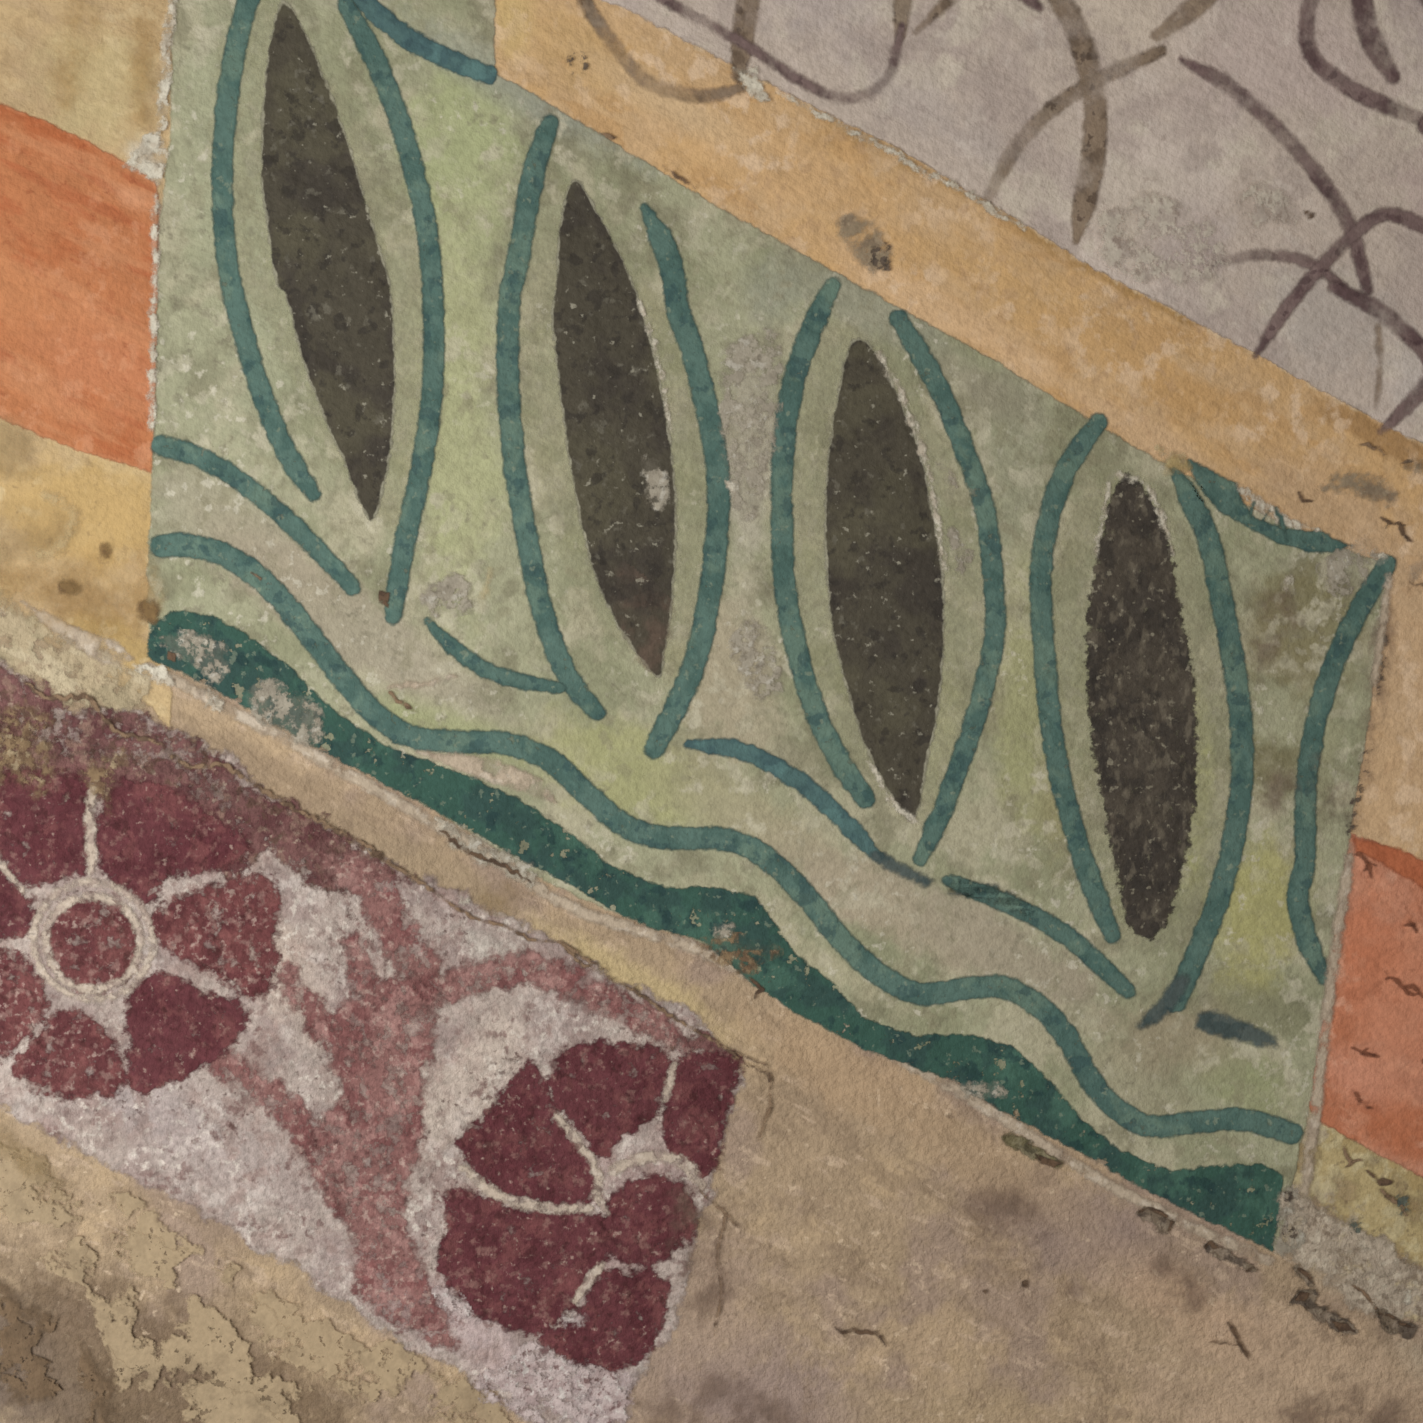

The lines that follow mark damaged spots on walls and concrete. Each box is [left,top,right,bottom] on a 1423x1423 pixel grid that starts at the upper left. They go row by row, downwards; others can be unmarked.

spalling [1001,1133,1062,1168]
spalling [1136,1206,1174,1234]
crack [700,1190,738,1326]
spalling [1204,1241,1257,1272]